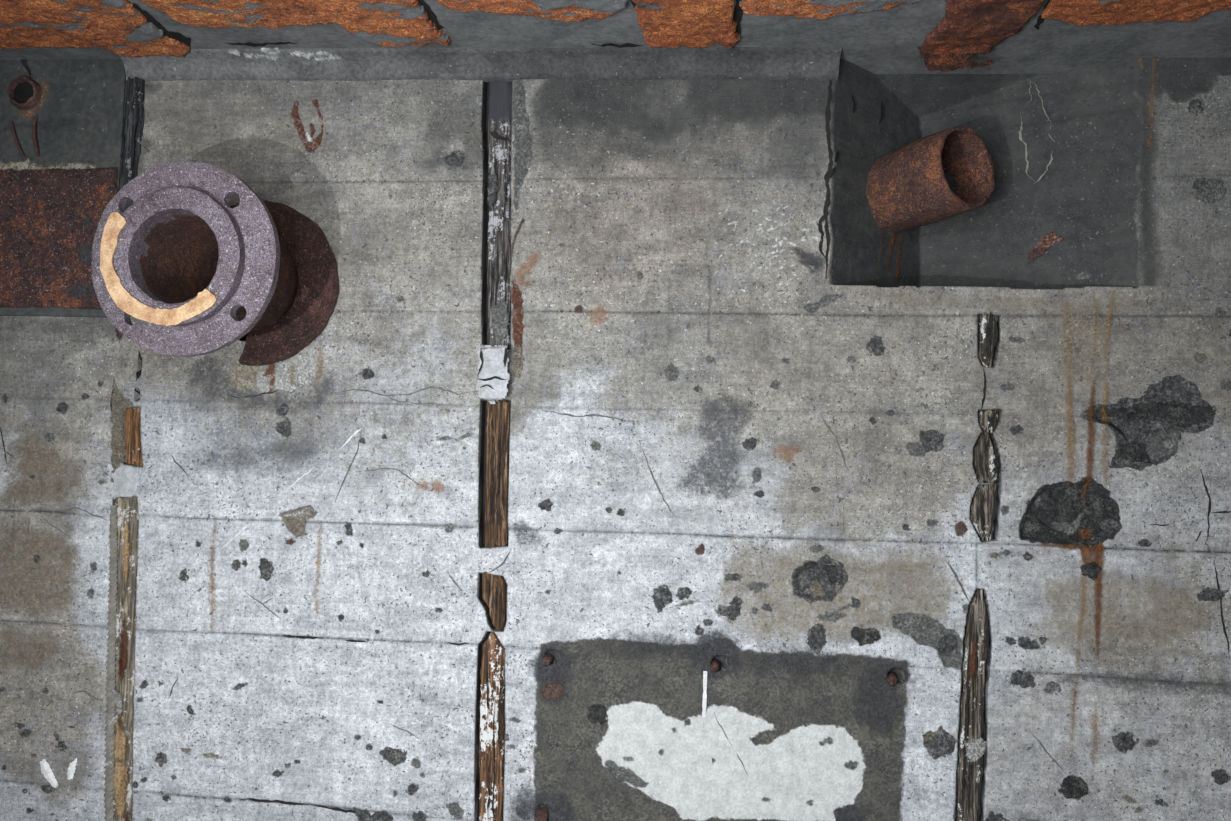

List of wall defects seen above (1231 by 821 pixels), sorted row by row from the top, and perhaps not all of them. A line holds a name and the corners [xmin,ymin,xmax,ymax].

corrosion [263,364,275,391]
corrosion [1066,308,1111,494]
spalling [1081,375,1217,471]
spalling [990,477,1122,561]
damp [0,525,78,614]
peeling [516,544,908,821]
spalling [892,612,963,669]
corrosion [1043,543,1105,654]
spalling [1080,562,1102,580]
crack [1196,471,1231,657]
spalling [922,726,957,759]